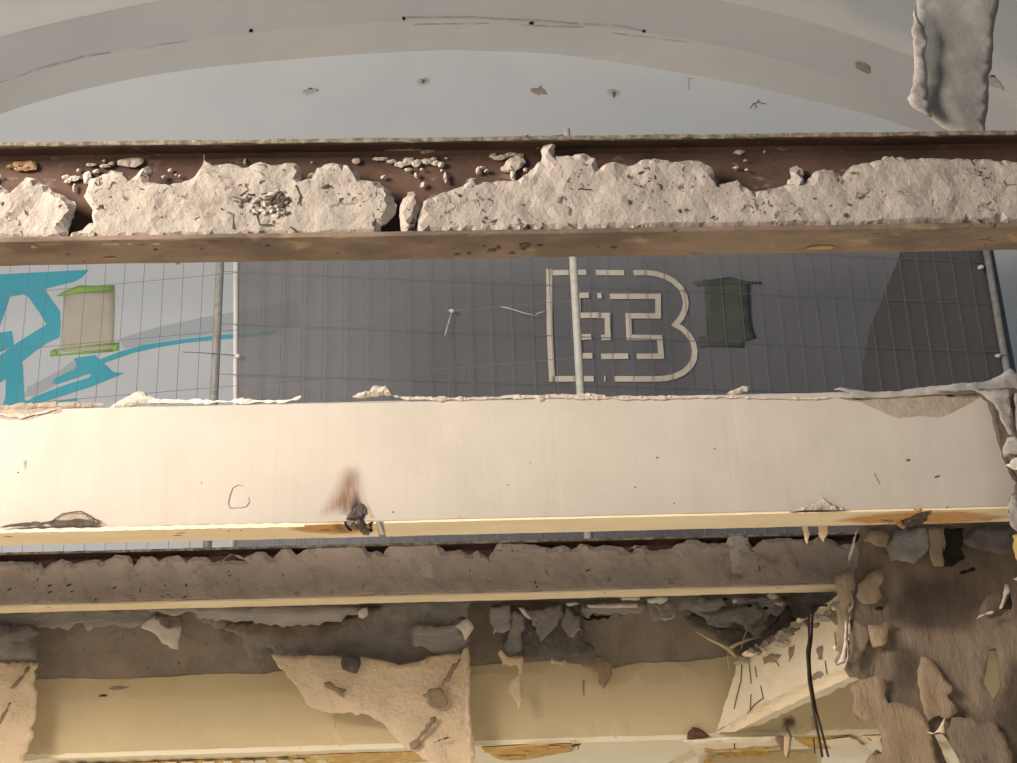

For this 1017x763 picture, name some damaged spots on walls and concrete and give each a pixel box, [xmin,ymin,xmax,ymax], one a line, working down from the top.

peeling [0,161,31,179]
peeling [62,159,115,192]
peeling [372,149,448,188]
peeling [476,152,527,181]
spalling [233,191,296,217]
corrosion [336,478,358,512]
corrosion [298,524,359,534]
peeling [140,614,183,649]
peeling [455,616,474,640]